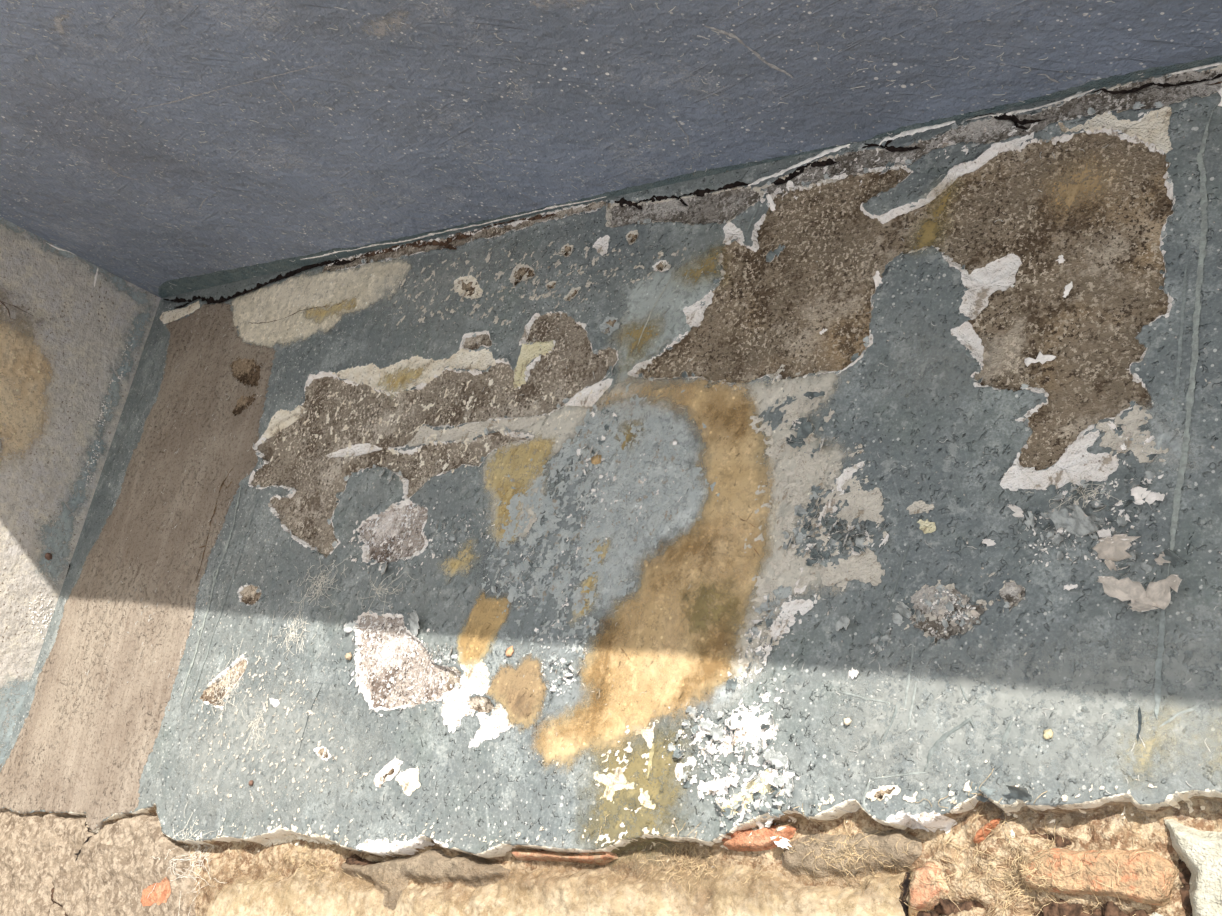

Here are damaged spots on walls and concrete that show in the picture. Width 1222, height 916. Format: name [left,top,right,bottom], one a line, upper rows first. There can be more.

crack [608,140,920,210]
crack [967,112,1047,130]
crack [1091,74,1222,94]
crack [164,213,556,324]
damp [0,321,53,462]
spalling [230,65,1222,612]
peeling [726,461,890,692]
spalling [869,580,985,659]
spalling [343,610,514,748]
peeling [634,727,654,749]
peeling [667,705,793,849]